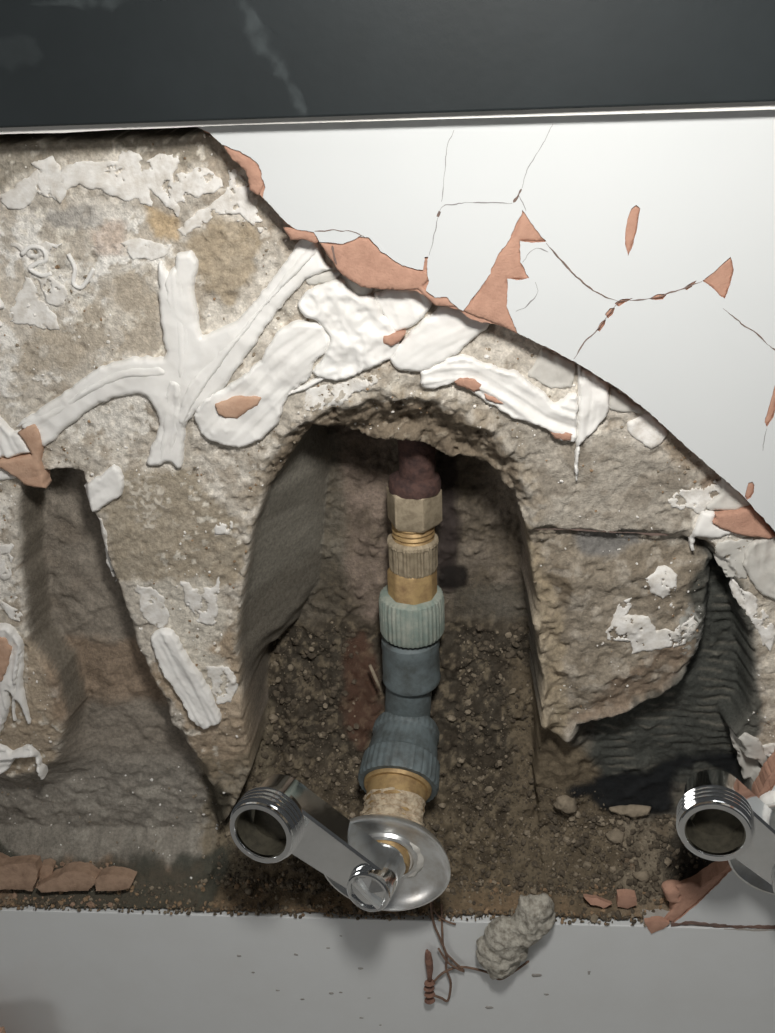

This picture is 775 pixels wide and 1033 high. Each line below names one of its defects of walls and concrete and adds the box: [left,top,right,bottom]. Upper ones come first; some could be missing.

flaking render [0,145,268,236]
crack [429,124,553,254]
spalling [283,211,546,334]
crack [517,243,702,356]
spalling [703,258,733,297]
crack [724,309,775,350]
peeling [215,395,261,418]
peeling [0,424,52,488]
flaking render [646,565,678,599]
peeling [668,480,775,652]
flaking render [606,598,699,654]
flaking render [730,729,775,789]